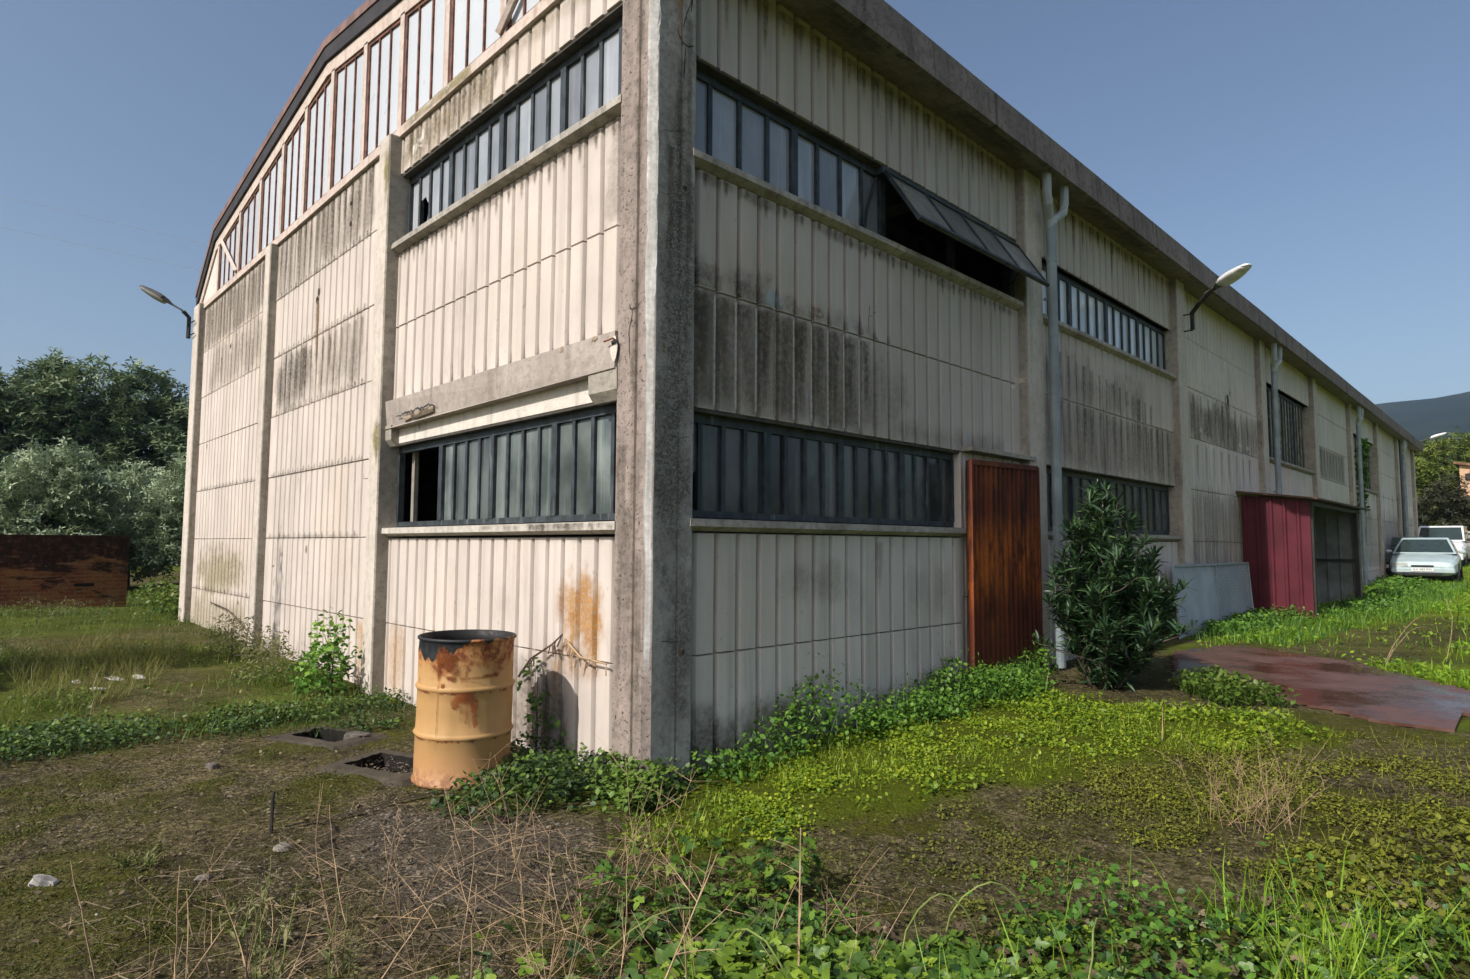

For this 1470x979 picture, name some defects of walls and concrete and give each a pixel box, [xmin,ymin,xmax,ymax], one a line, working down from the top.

damp [205,167,386,347]
damp [277,309,362,402]
damp [622,0,874,660]
corrosion [569,576,601,655]